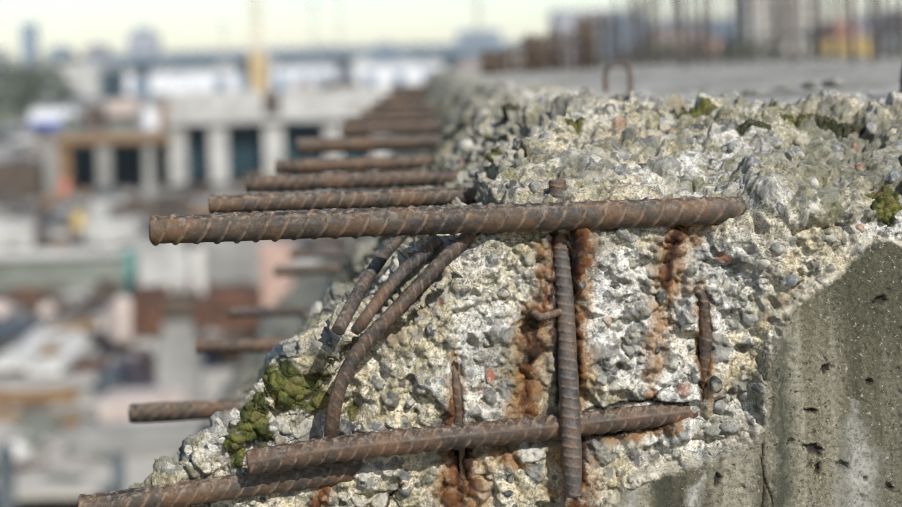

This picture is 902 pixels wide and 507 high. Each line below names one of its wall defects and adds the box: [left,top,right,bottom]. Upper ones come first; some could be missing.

spalling [128,233,461,489]
rust [78,84,747,507]
spalling [186,69,902,507]
crack [761,443,773,507]